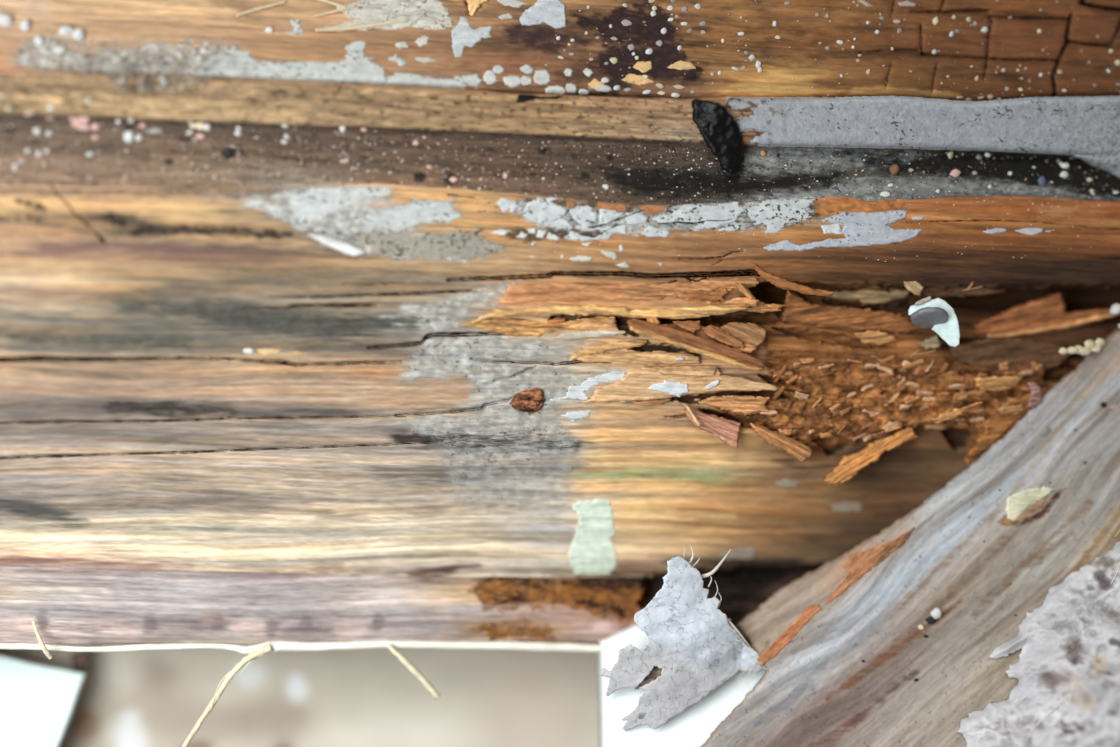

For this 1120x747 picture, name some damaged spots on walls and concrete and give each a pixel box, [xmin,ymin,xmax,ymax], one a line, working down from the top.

peeling [192,0,654,95]
water stain [505,1,703,95]
crack [875,0,1120,97]
peeling [290,187,392,223]
peeling [348,196,926,268]
crack [0,331,609,460]
peeling [550,371,625,421]
peeling [648,380,689,397]
spalling [702,282,1120,462]